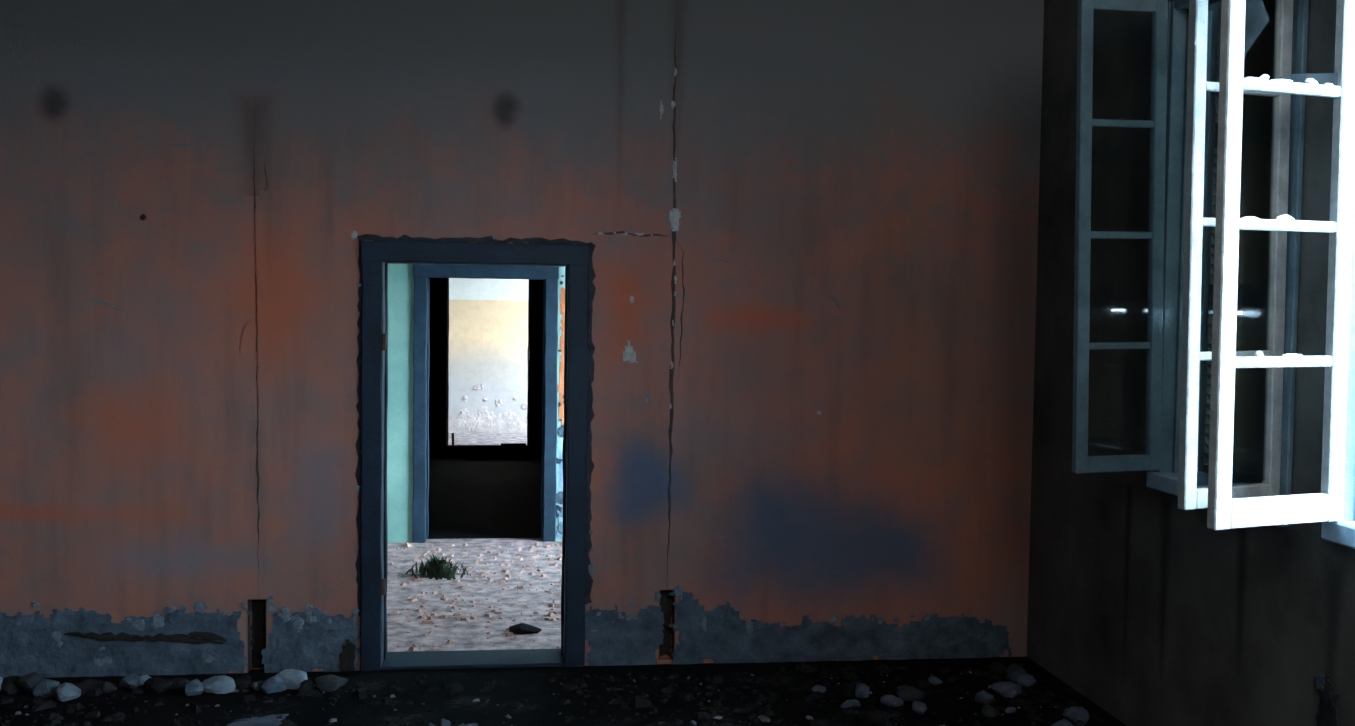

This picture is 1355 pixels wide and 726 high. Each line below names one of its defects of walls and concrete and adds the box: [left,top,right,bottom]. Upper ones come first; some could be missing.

rust [189,190,360,420]
rust [591,252,661,440]
crack [591,0,685,588]